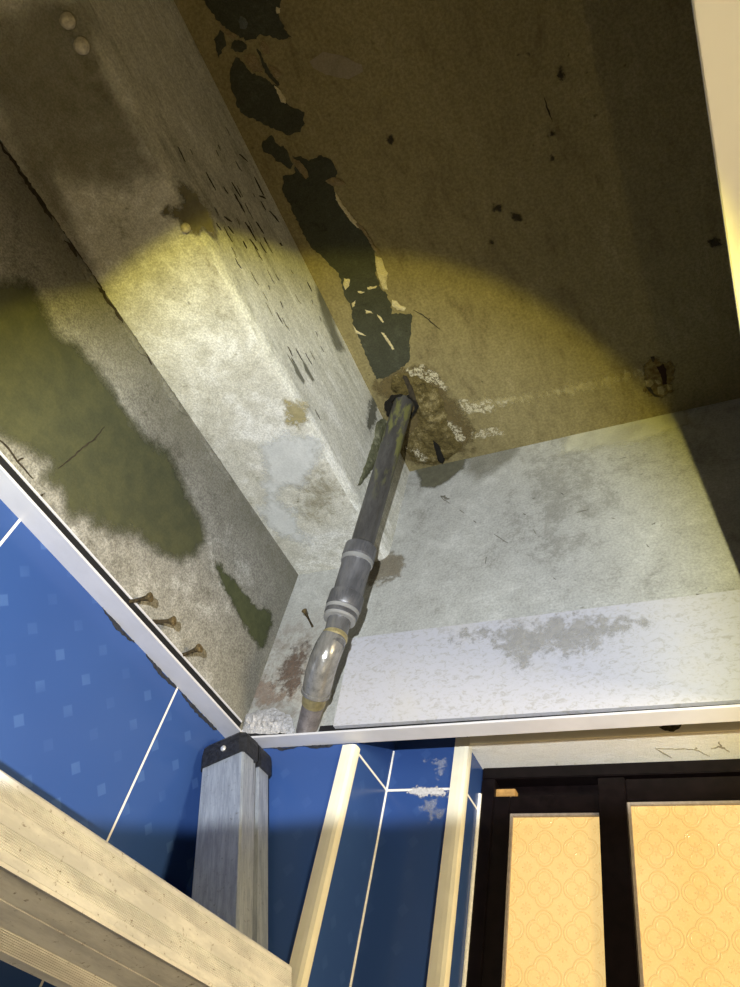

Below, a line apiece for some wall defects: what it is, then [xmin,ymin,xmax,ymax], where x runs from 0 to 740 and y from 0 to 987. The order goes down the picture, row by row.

peeling [203,0,475,465]
water stain [0,278,204,561]
corrosion [254,641,310,705]